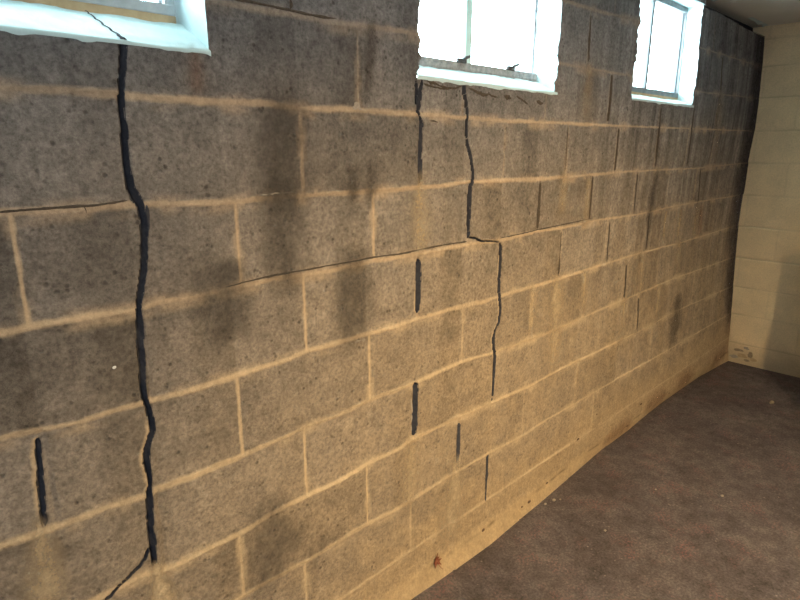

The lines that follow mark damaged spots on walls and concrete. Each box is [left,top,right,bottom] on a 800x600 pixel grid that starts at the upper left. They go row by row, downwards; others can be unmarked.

crack [230,80,594,401]
crack [0,10,157,600]
crack [411,383,419,436]
crack [454,423,462,470]
crack [483,455,491,501]